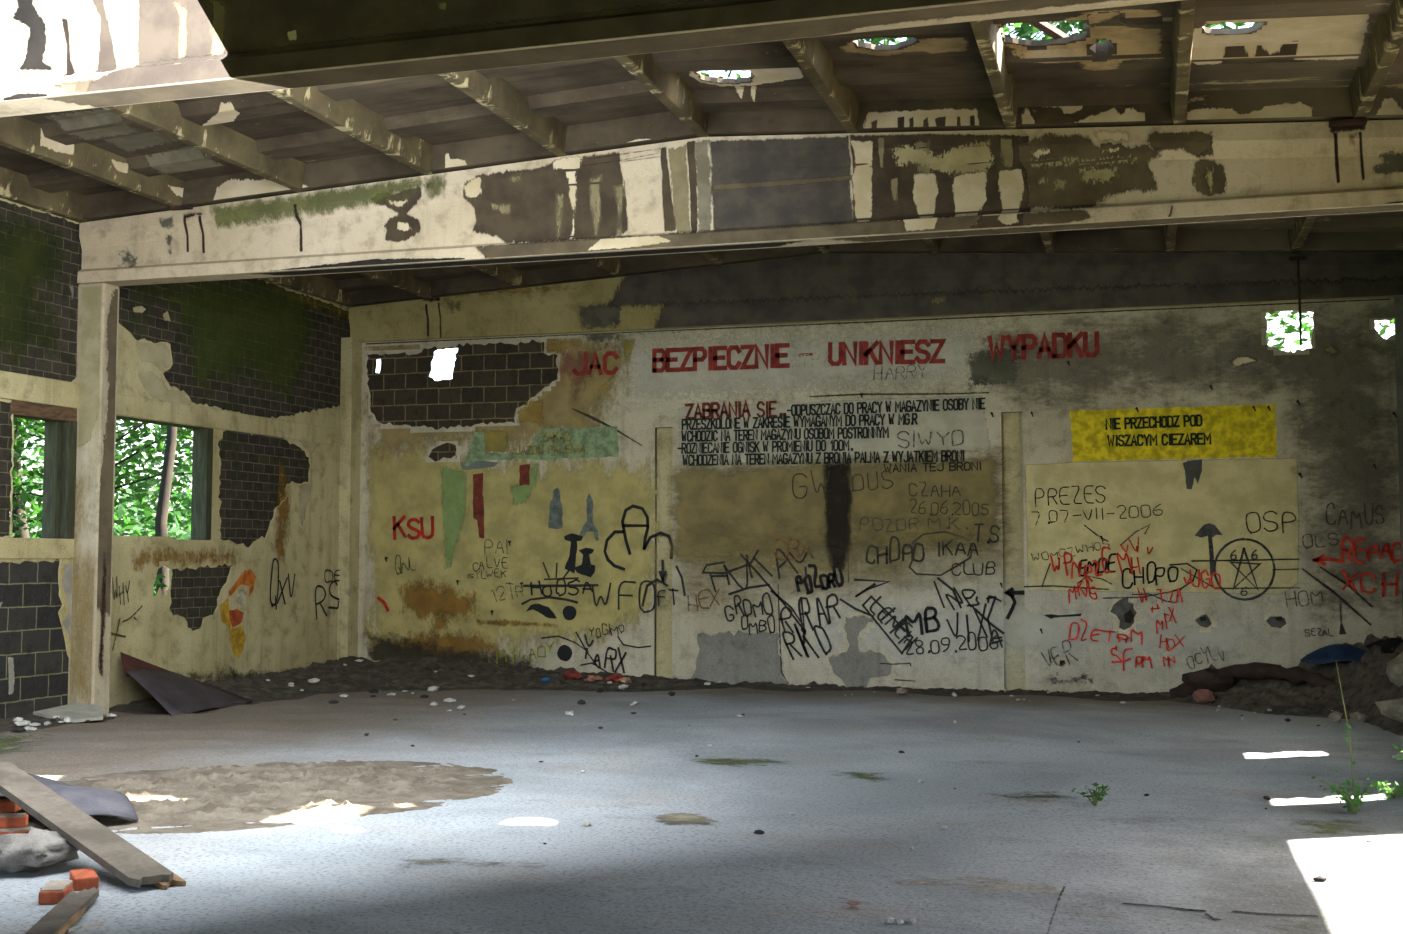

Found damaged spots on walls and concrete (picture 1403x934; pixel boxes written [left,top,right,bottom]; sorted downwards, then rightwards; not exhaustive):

peeling [1191,14,1370,65]
peeling [689,67,803,102]
peeling [445,153,467,168]
leakage [213,179,422,252]
peeling [576,235,671,253]
peeling [903,217,938,231]
spalling [0,198,101,447]
spalling [118,187,465,419]
spalling [365,338,559,462]
spalling [217,430,311,549]
spalling [168,563,234,632]
spalling [0,559,72,718]